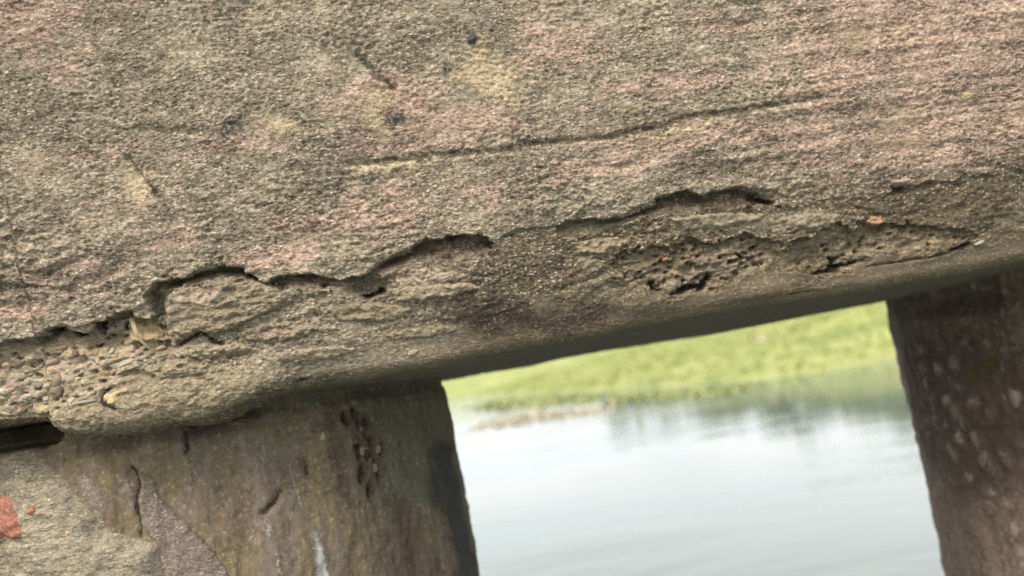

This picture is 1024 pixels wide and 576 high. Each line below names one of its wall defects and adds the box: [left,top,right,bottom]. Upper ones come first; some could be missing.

spalling [556,189,976,311]
spalling [0,235,491,417]
crack [131,466,142,536]